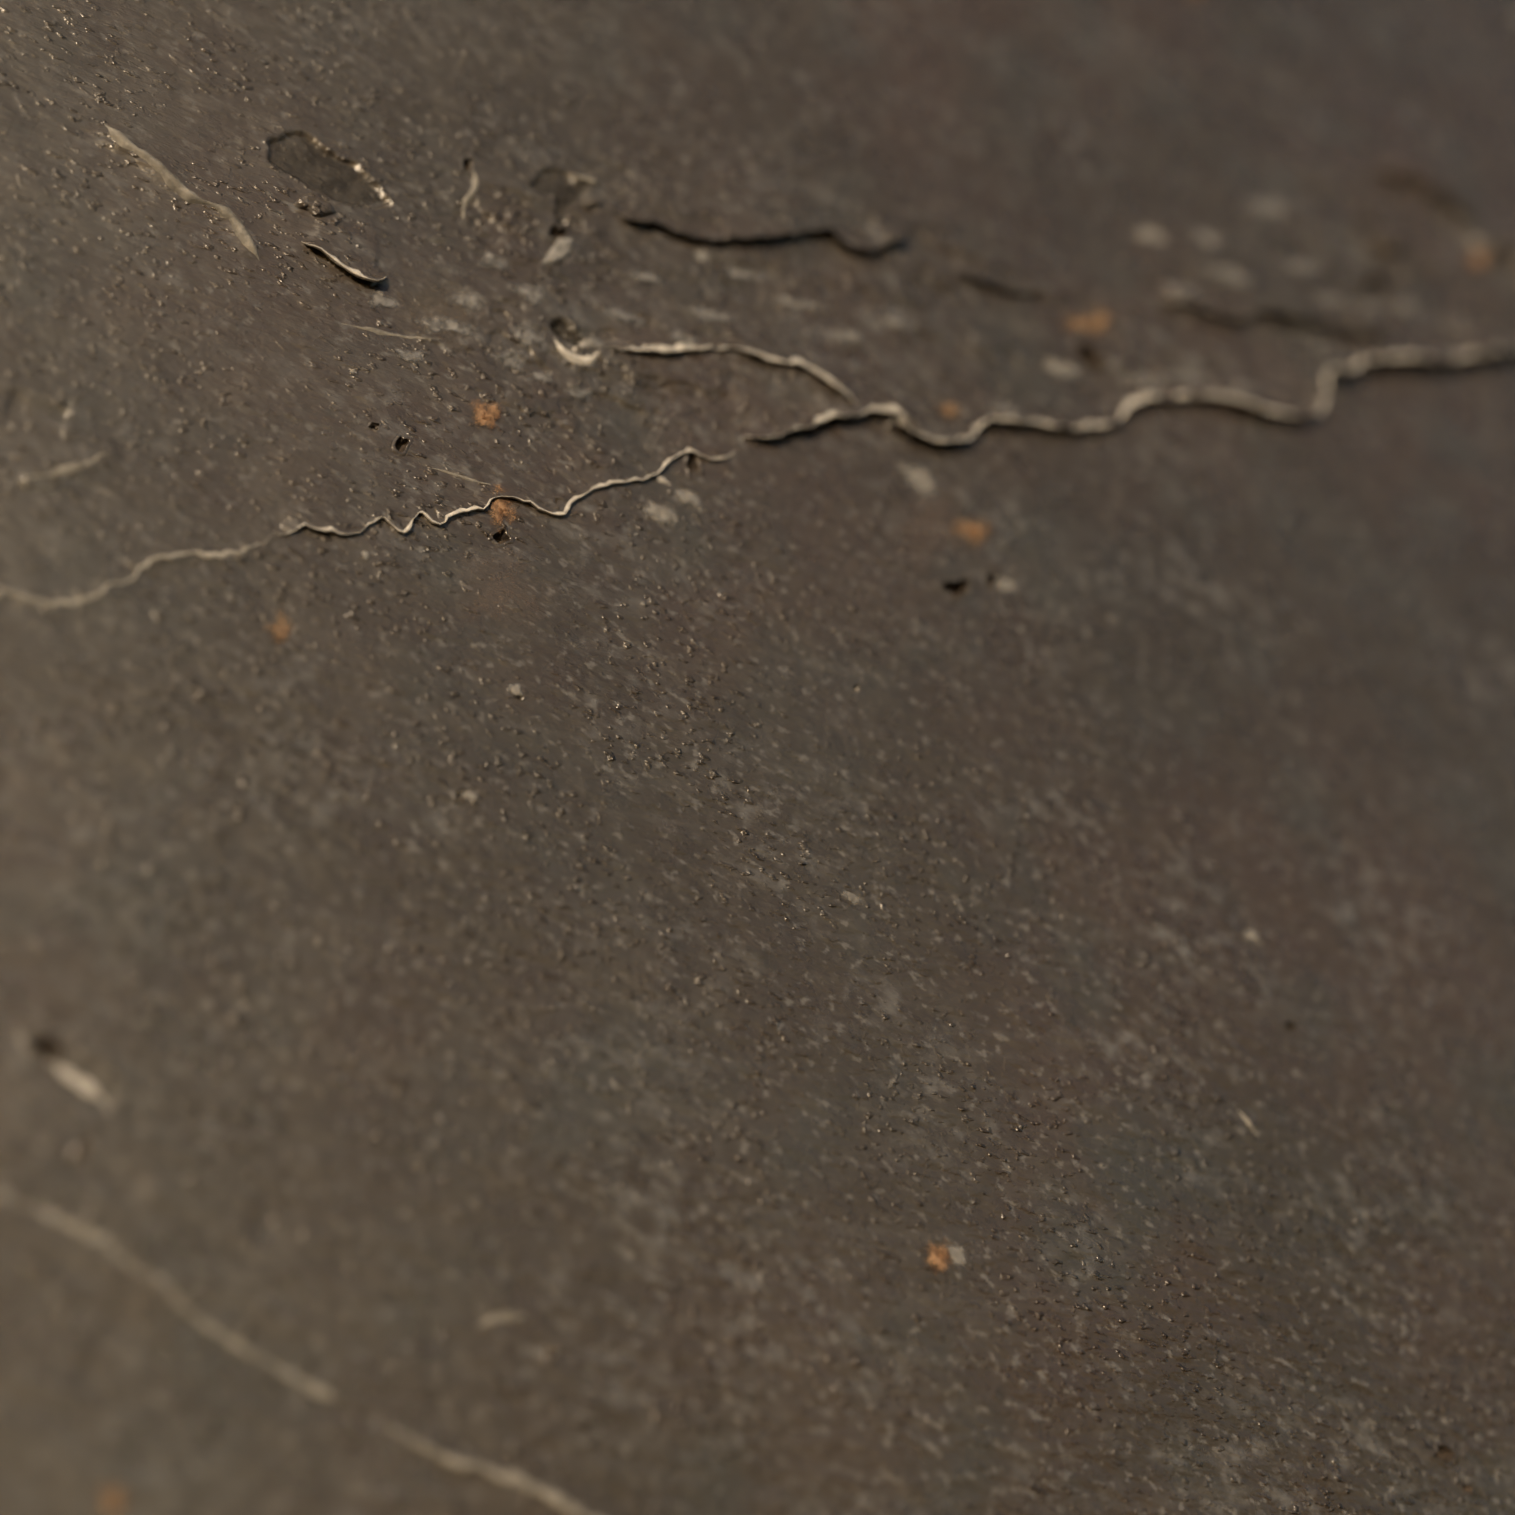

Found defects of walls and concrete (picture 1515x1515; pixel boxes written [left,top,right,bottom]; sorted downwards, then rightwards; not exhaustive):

peeling [273,140,378,218]
peeling [301,236,387,283]
peeling [536,170,909,266]
peeling [552,323,604,350]
crack [10,1198,341,1401]
crack [386,1425,590,1515]